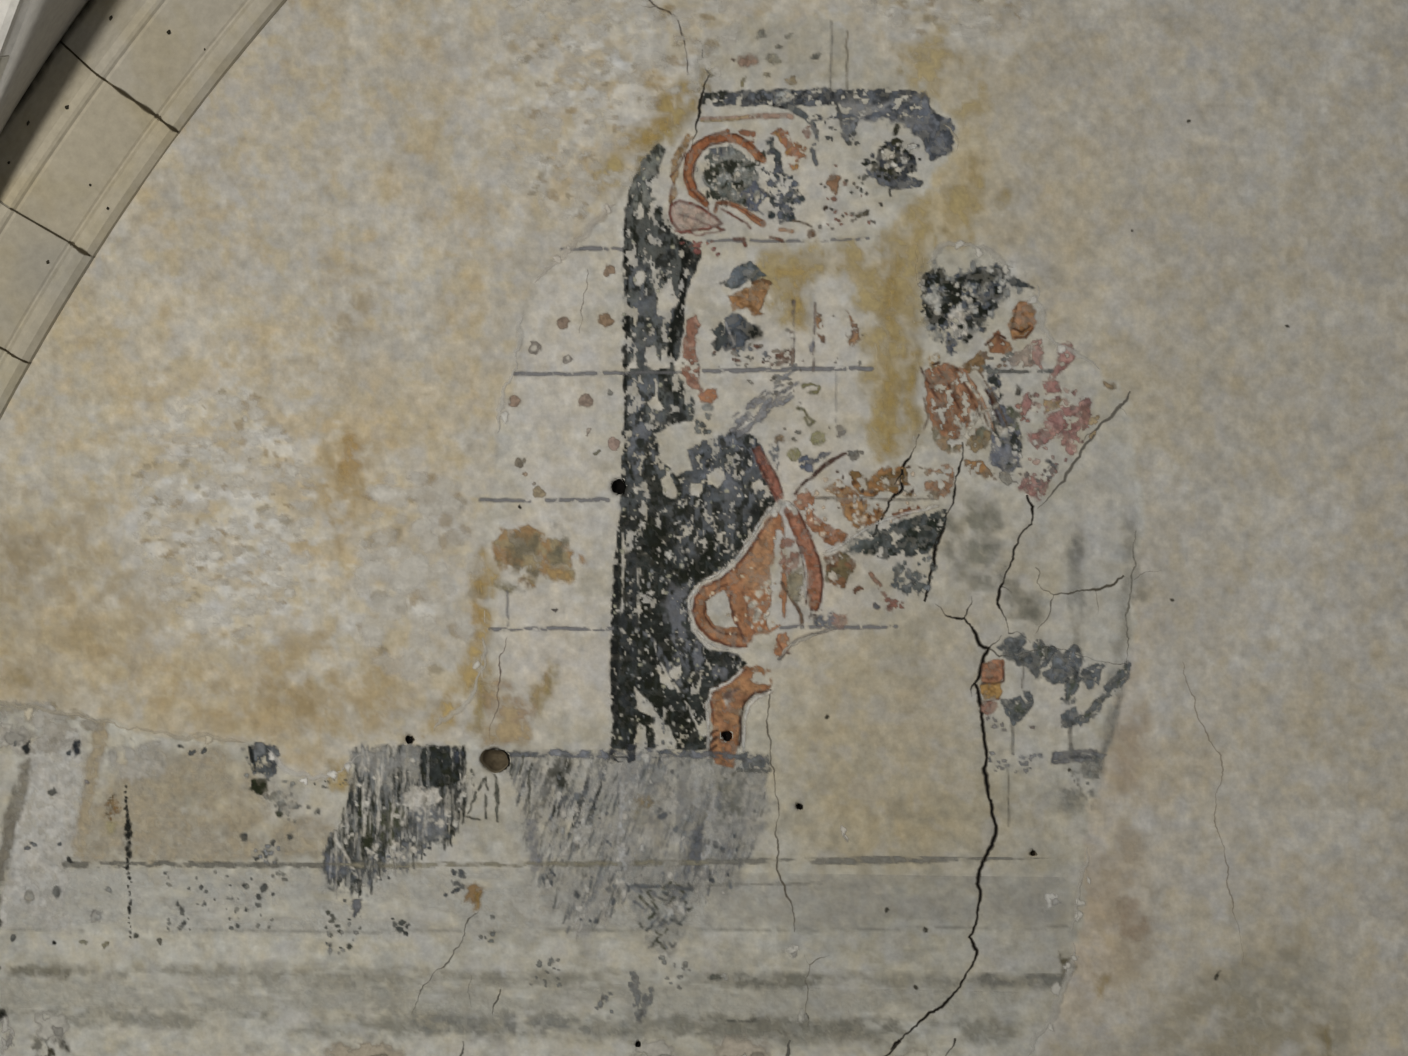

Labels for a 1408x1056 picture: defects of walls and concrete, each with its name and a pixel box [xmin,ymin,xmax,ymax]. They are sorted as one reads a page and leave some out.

crack [649,0,710,133]
leakage [757,247,824,324]
leakage [846,200,930,450]
crack [872,454,912,538]
leakage [948,510,999,584]
crack [885,391,1136,1056]